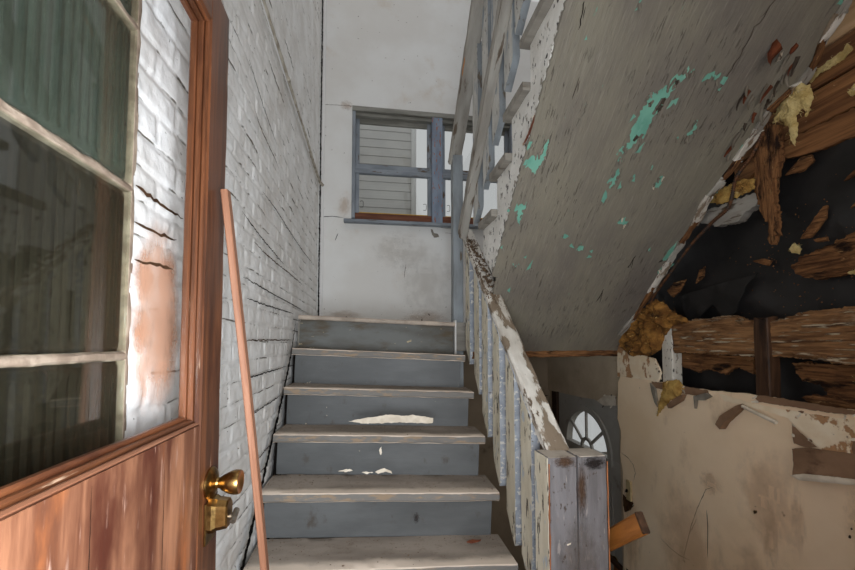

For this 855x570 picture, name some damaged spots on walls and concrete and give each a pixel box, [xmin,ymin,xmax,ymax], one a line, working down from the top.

peeling [724,39,801,161]
peeling [522,115,549,178]
peeling [601,66,728,203]
crack [134,185,183,241]
peeling [507,202,527,225]
crack [135,259,173,270]
water stain [139,248,174,393]
peeling [350,415,433,424]
flaking render [623,495,634,512]